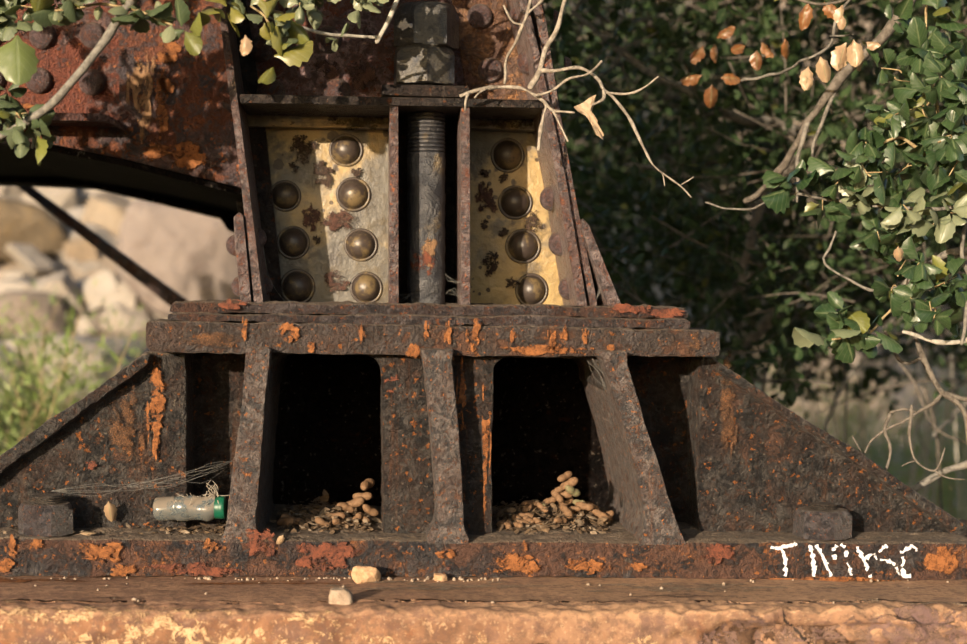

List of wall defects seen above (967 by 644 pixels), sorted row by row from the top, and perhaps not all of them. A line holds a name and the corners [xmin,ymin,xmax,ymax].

corrosion [125,41,210,170]
corrosion [279,322,315,353]
corrosion [405,320,431,358]
corrosion [502,324,595,356]
corrosion [108,359,166,461]
corrosion [482,412,492,514]
corrosion [0,534,90,582]
corrosion [77,538,361,585]
corrosion [243,528,275,557]
corrosion [493,540,541,575]
corrosion [565,557,611,575]
corrosion [923,546,960,575]